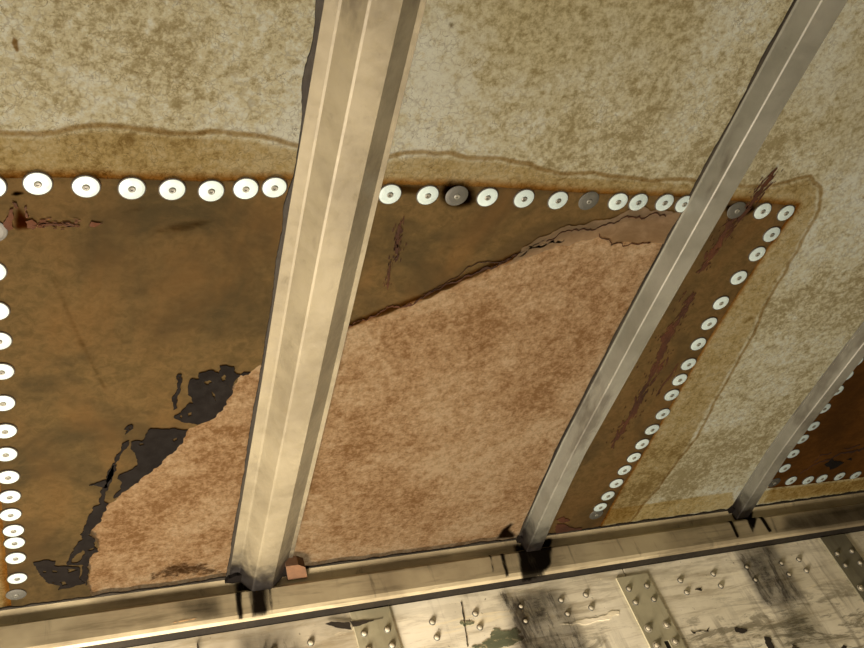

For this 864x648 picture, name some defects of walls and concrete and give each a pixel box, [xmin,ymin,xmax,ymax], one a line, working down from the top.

rust [16,211,27,229]
crack [33,218,80,230]
crack [348,212,666,328]
crack [606,167,783,449]
peeling [33,365,251,590]
peeling [555,517,582,534]
water stain [514,539,552,582]
peeling [472,628,519,648]
water stain [502,593,582,648]
peeling [563,611,619,625]